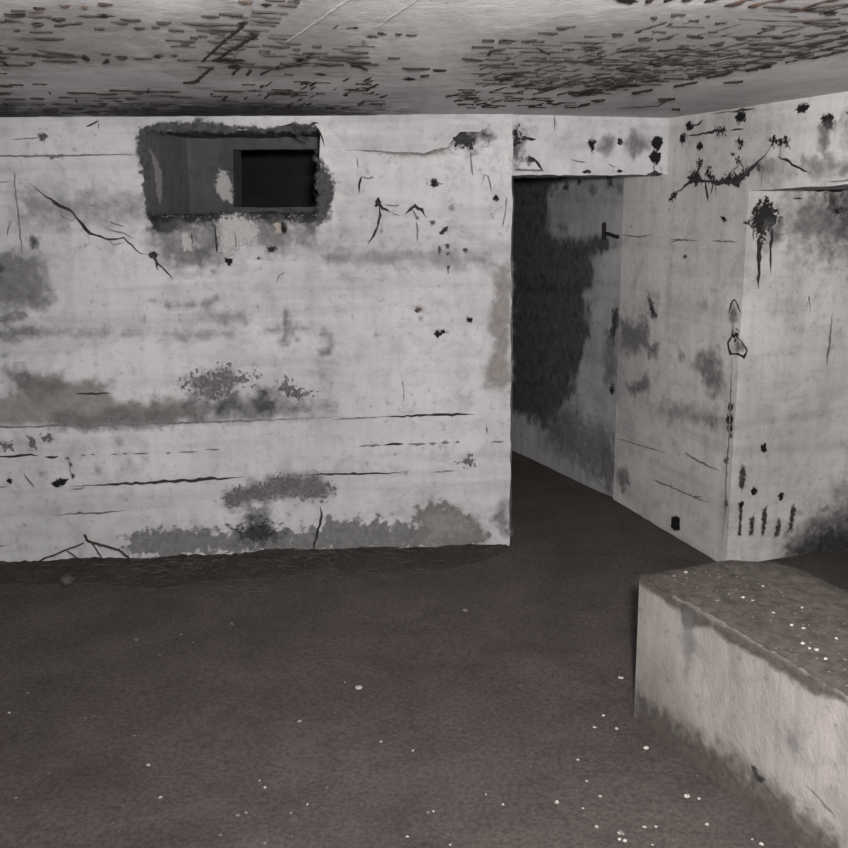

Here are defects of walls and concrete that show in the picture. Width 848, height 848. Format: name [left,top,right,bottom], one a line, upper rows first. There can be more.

spalling [0,0,417,115]
spalling [388,57,447,81]
spalling [445,0,848,111]
crack [687,110,742,137]
crack [0,133,173,279]
spalling [181,170,260,257]
crack [669,135,848,201]
water stain [0,253,50,340]
water stain [487,177,628,491]
water stain [0,372,200,429]
crack [0,449,240,490]
water stain [121,501,492,557]